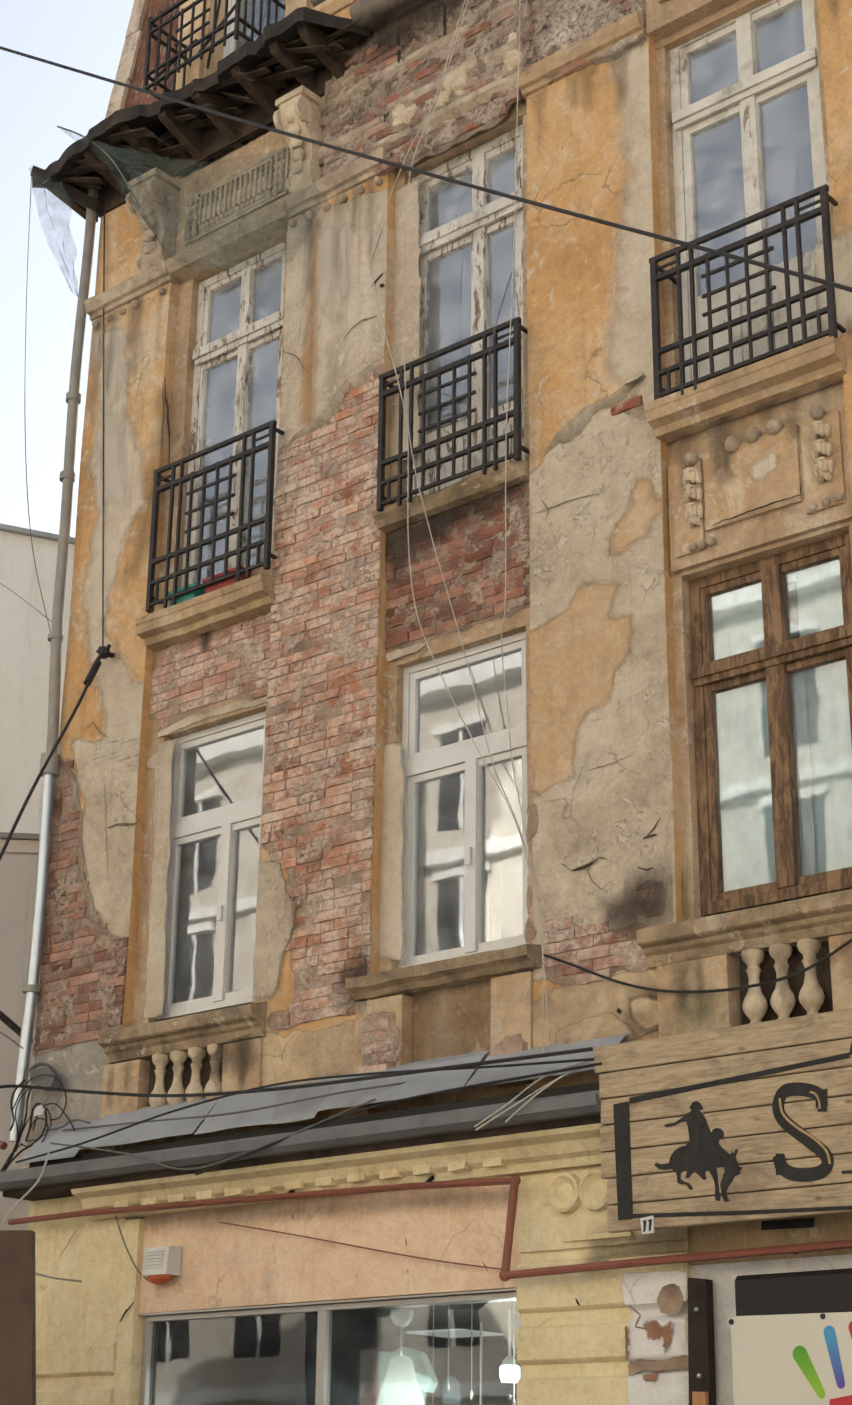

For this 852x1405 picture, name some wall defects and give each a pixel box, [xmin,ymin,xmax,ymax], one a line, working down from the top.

peeling [814,230,852,337]
peeling [750,452,777,480]
flaking render [32,0,676,1086]
crack [561,819,660,889]
peeling [622,1270,689,1405]